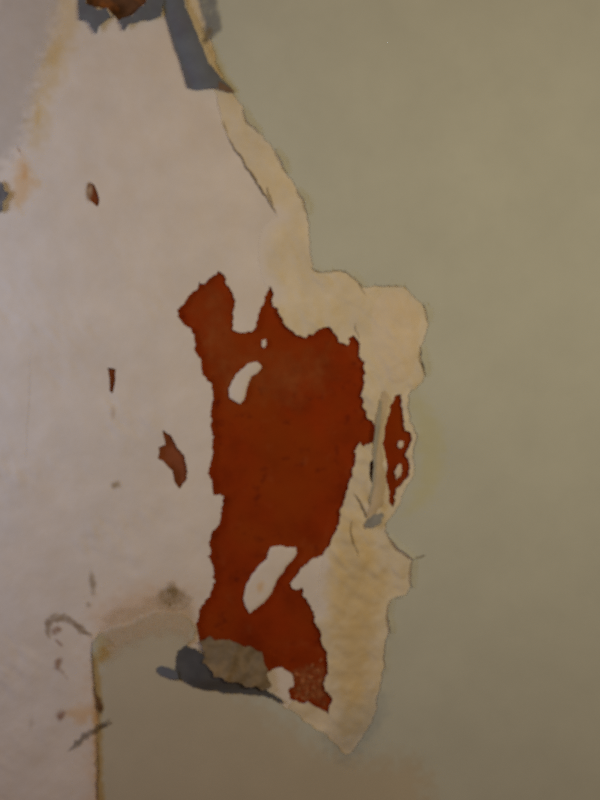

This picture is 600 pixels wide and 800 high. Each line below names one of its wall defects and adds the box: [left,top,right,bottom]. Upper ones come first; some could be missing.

peeling [0,0,433,800]